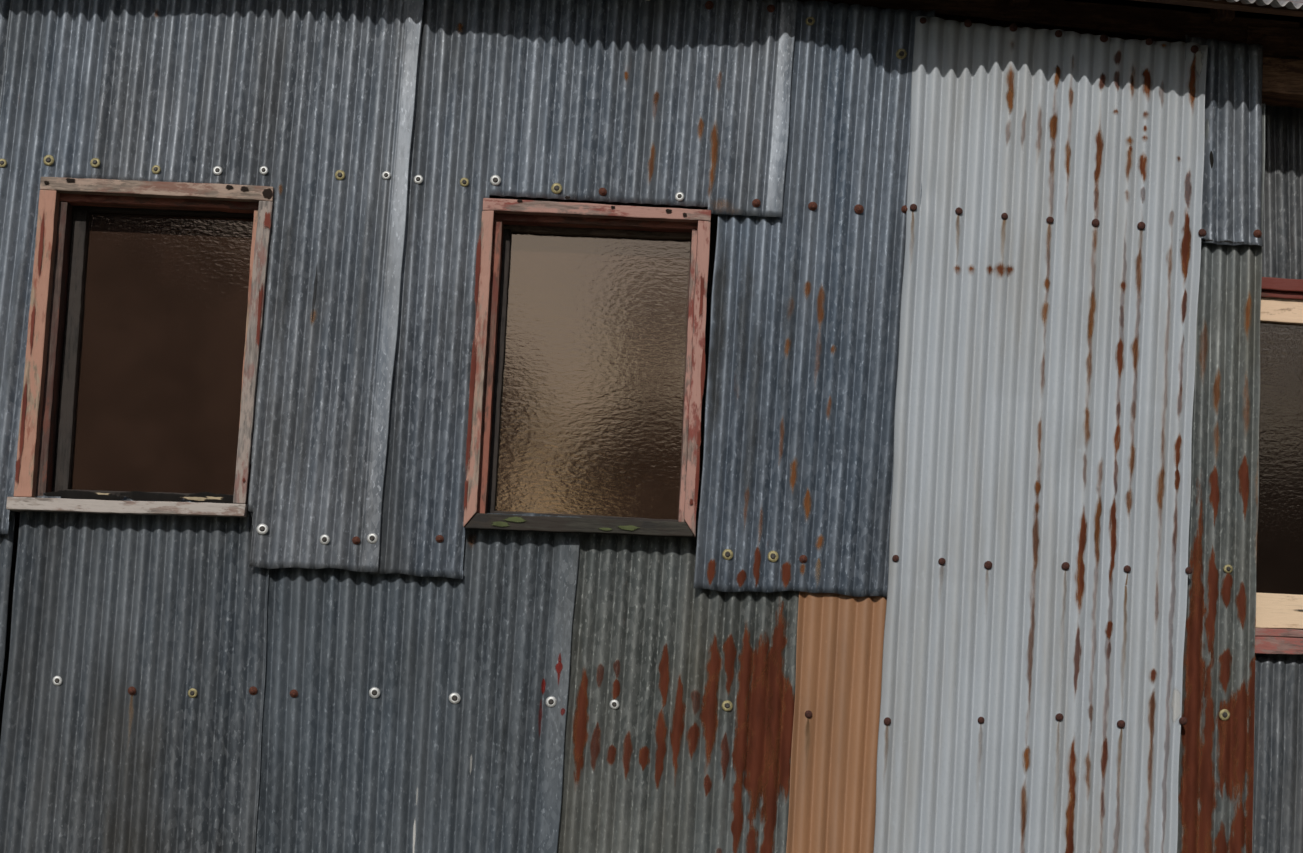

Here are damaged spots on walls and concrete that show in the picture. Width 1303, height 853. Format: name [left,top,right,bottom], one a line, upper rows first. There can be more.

corrosion [1050,115,1071,175]
corrosion [1094,130,1104,182]
corrosion [1099,51,1151,181]
corrosion [1178,157,1191,322]
corrosion [1115,338,1138,375]
corrosion [1033,481,1041,566]
corrosion [1075,425,1135,640]
corrosion [1157,436,1182,509]
corrosion [1178,371,1258,853]
corrosion [573,602,809,853]
corrosion [1149,669,1157,734]
corrosion [1065,728,1122,853]